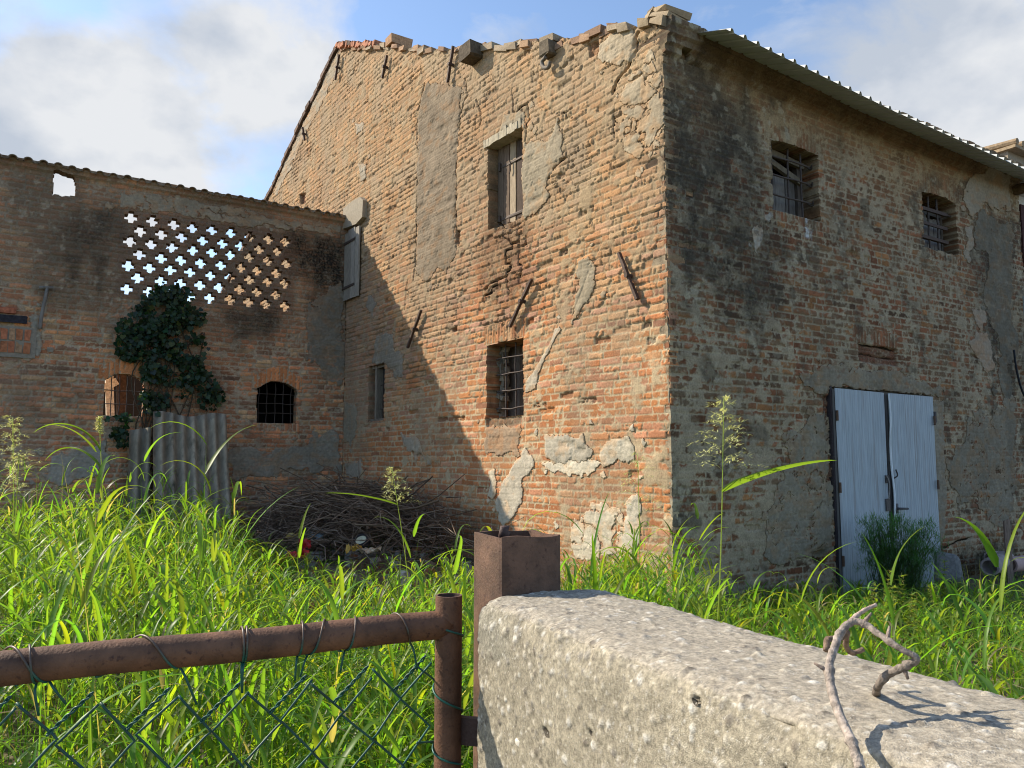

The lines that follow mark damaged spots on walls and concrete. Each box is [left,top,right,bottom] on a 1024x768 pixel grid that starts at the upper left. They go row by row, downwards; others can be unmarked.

peeling [591,27,666,178]
crack [484,222,528,300]
peeling [501,117,564,229]
peeling [960,166,1012,264]
peeling [525,243,607,393]
peeling [968,308,998,384]
peeling [477,417,647,531]
peeling [553,494,647,569]